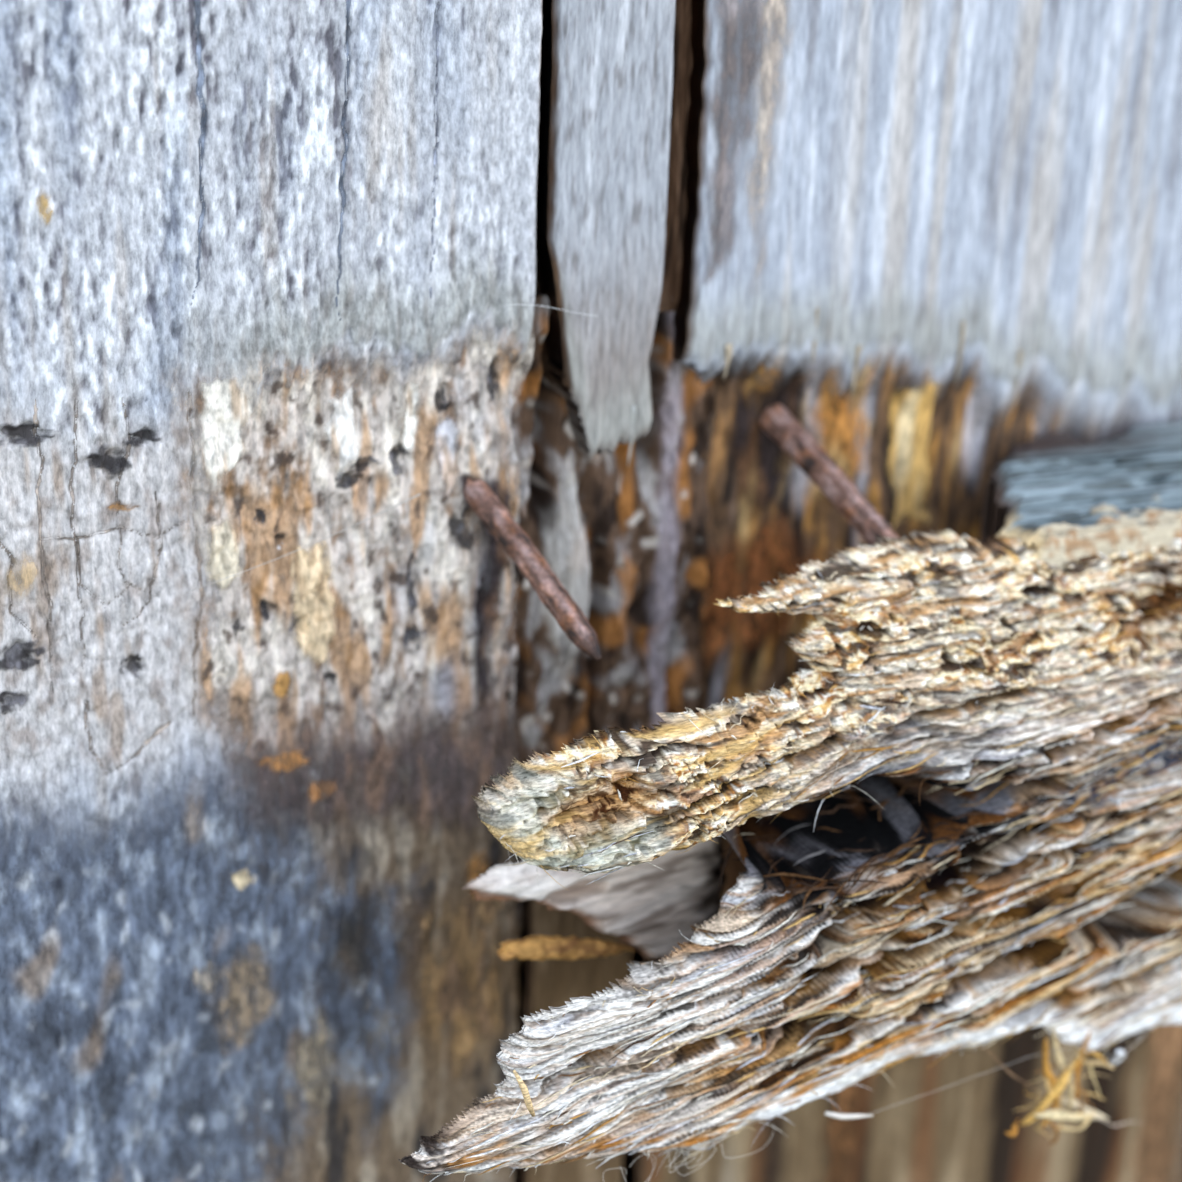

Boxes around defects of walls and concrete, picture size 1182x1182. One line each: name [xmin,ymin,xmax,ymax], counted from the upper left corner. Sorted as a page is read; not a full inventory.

crack [192,0,208,299]
crack [336,0,351,320]
rust [731,381,869,510]
rust [461,474,510,700]
rust [701,523,811,662]
water stain [253,727,508,827]
water stain [0,797,411,1182]
water stain [417,898,505,1066]